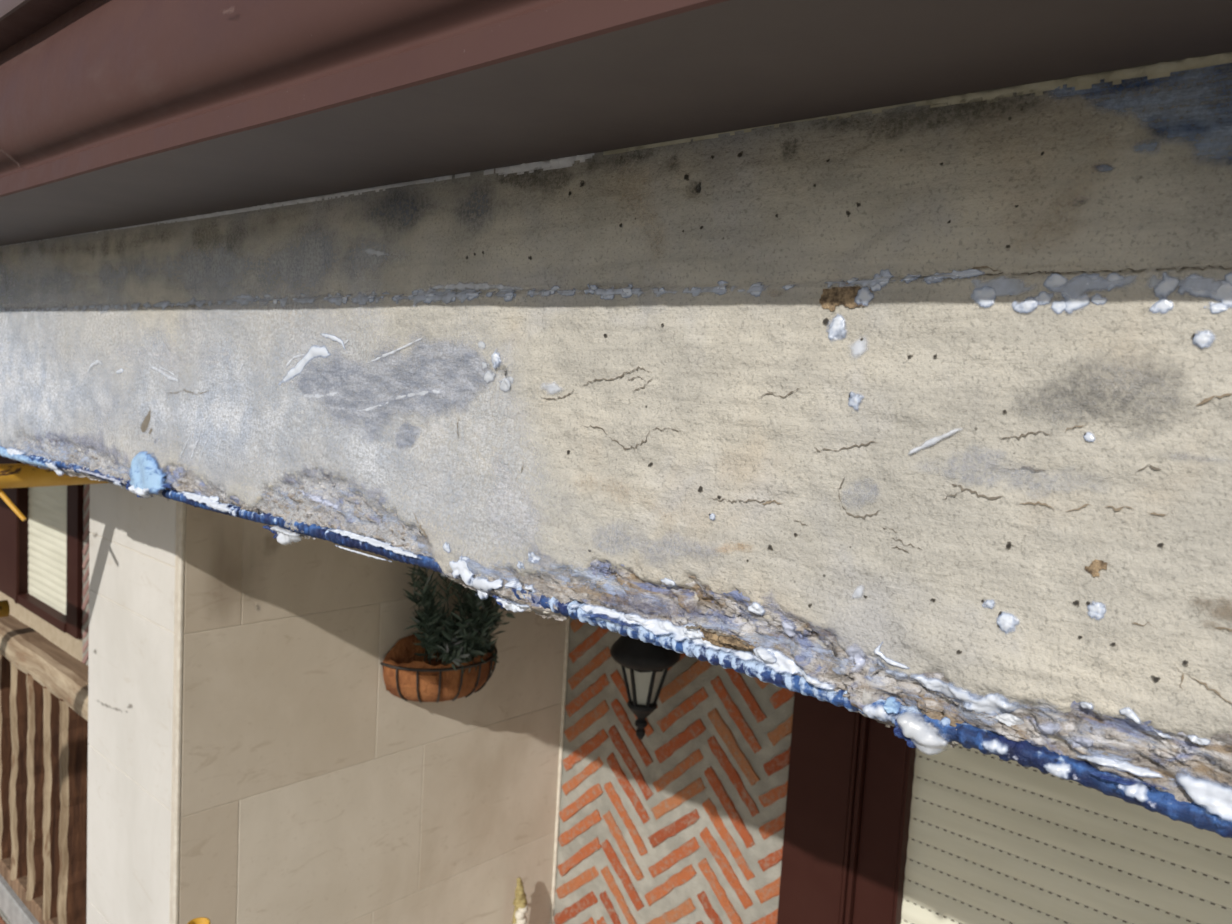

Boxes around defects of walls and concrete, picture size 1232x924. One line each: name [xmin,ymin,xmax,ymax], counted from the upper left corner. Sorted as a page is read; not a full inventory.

damp [1053,63,1232,164]
peeling [819,270,944,311]
peeling [1012,273,1124,314]
peeling [1150,298,1173,313]
peeling [1204,273,1232,313]
damp [0,232,537,554]
crack [541,366,652,400]
peeling [140,410,153,434]
crack [585,425,683,450]
spalling [10,430,131,492]
damp [322,522,417,562]
spalling [149,464,1232,803]